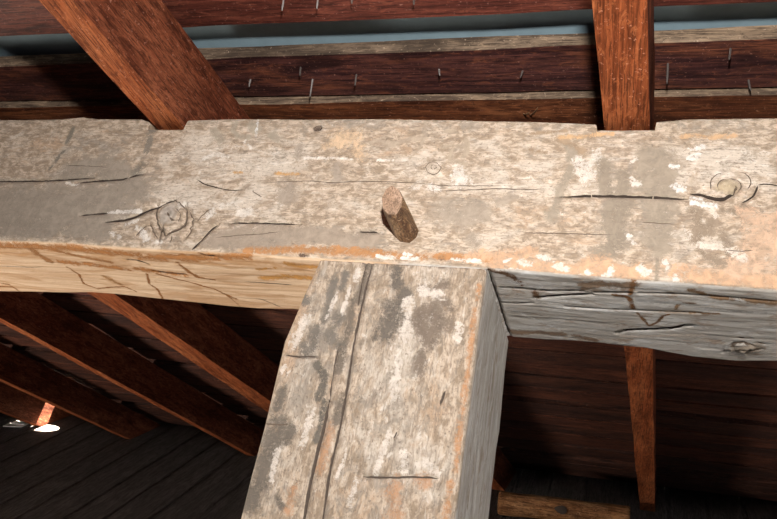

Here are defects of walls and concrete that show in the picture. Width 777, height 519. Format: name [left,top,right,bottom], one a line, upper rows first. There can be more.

crack [0,165,146,183]
crack [568,184,777,203]
crack [81,199,177,223]
crack [506,286,767,323]
crack [286,265,372,519]
crack [366,473,438,481]